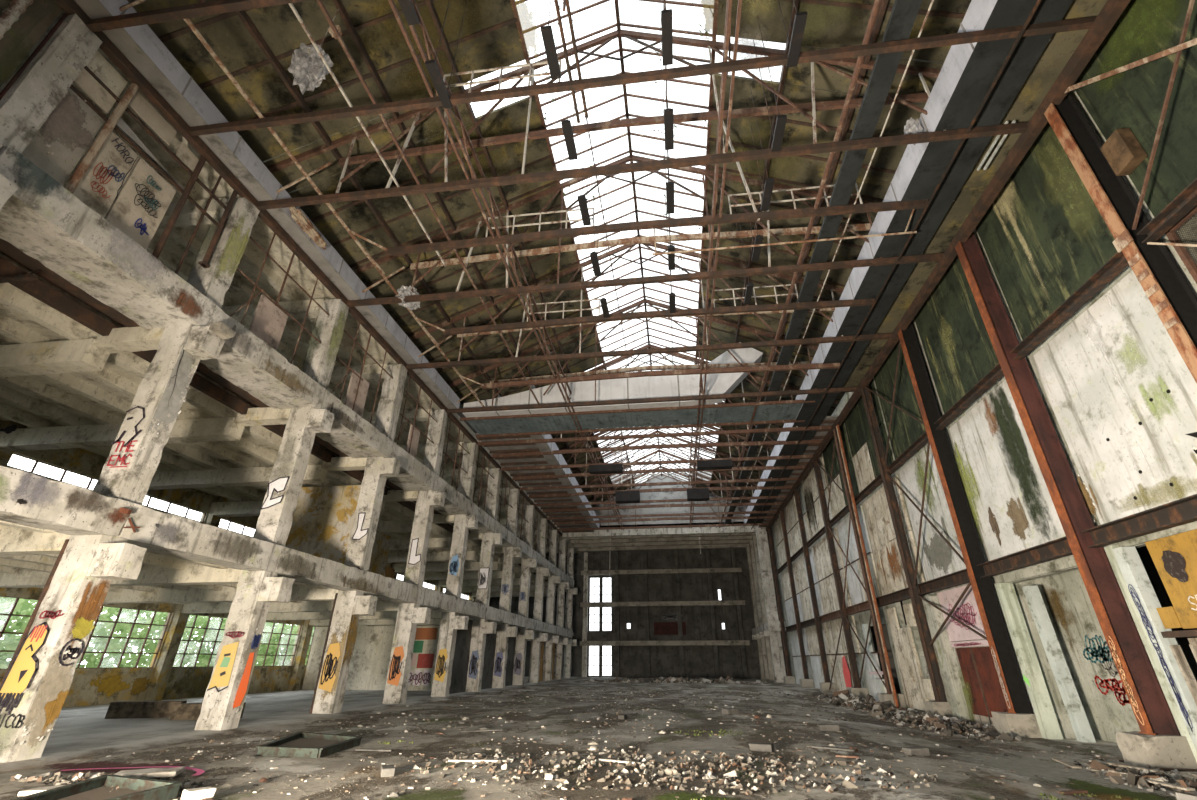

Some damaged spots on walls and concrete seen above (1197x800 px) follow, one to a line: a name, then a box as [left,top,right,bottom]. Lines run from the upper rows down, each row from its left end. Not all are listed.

leakage [992,182,1040,279]
leakage [1037,130,1093,233]
leakage [990,387,1049,538]